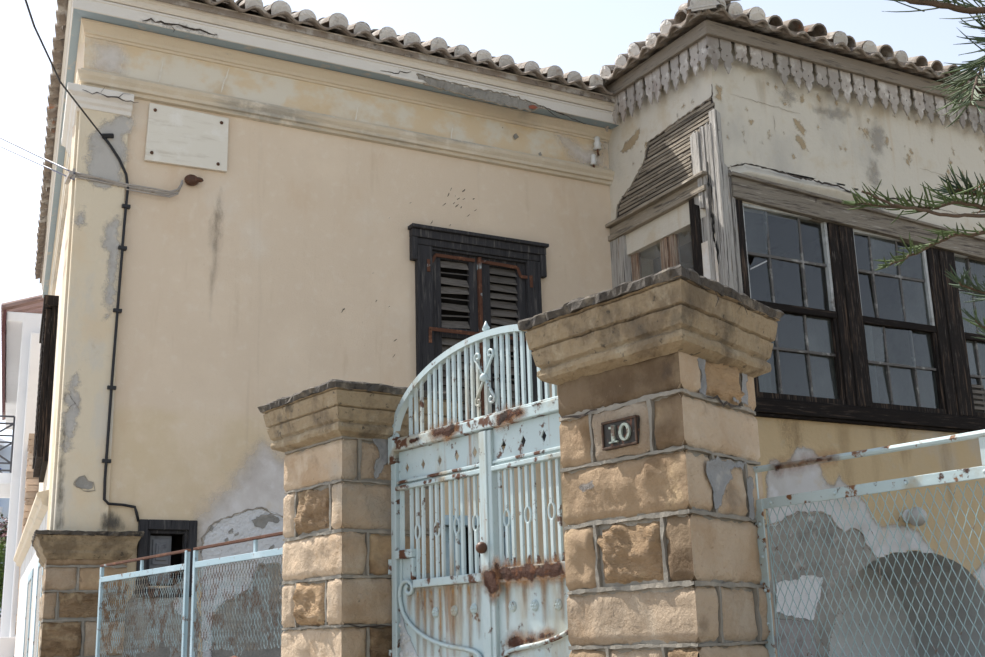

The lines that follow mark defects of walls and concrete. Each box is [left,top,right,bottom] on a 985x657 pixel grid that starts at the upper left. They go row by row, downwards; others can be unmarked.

crack [143,18,217,35]
peeling [86,115,133,188]
spalling [615,86,722,219]
rust [430,422,458,440]
rust [496,403,541,428]
spalling [73,475,95,492]
rust [774,455,834,472]
spalling [123,444,288,657]
rust [481,552,566,609]
flaking render [765,447,935,657]
rust [416,584,471,642]
rust [505,629,554,652]